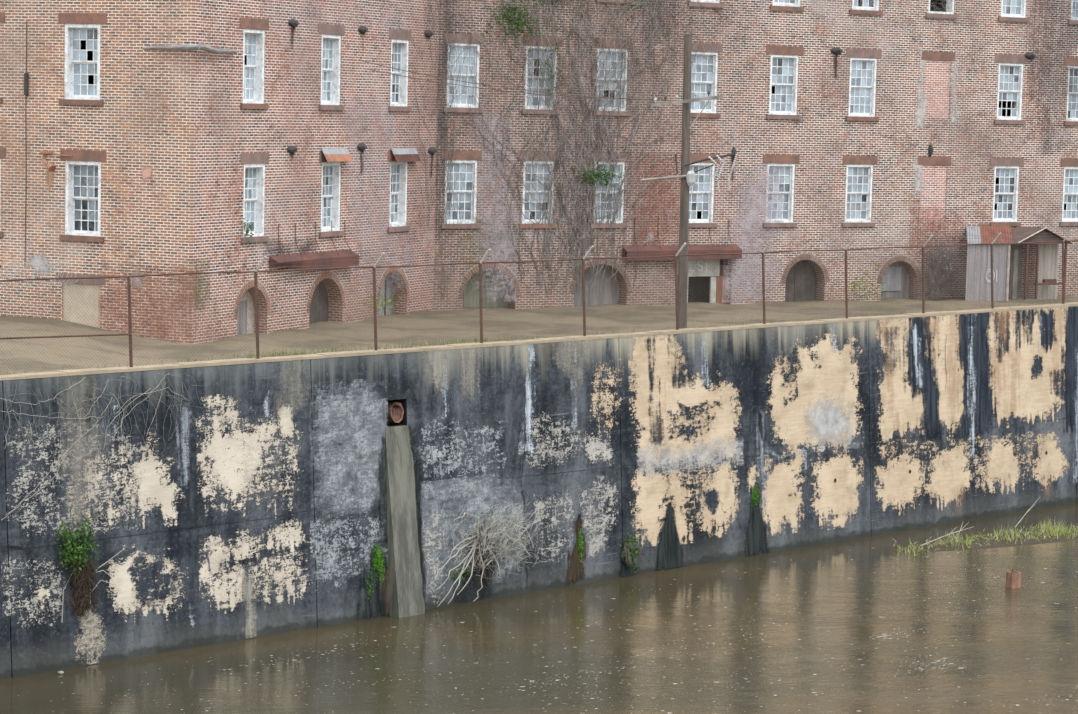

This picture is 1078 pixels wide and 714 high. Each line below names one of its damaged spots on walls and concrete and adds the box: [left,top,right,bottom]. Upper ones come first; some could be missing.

peeling [4,421,185,541]
peeling [73,385,388,664]
leakage [264,363,301,417]
leakage [423,348,480,412]
leakage [519,345,536,454]
peeling [413,307,1078,605]
leakage [777,347,822,405]
leakage [884,317,942,438]
leakage [955,306,1078,458]
peeling [1,555,66,629]